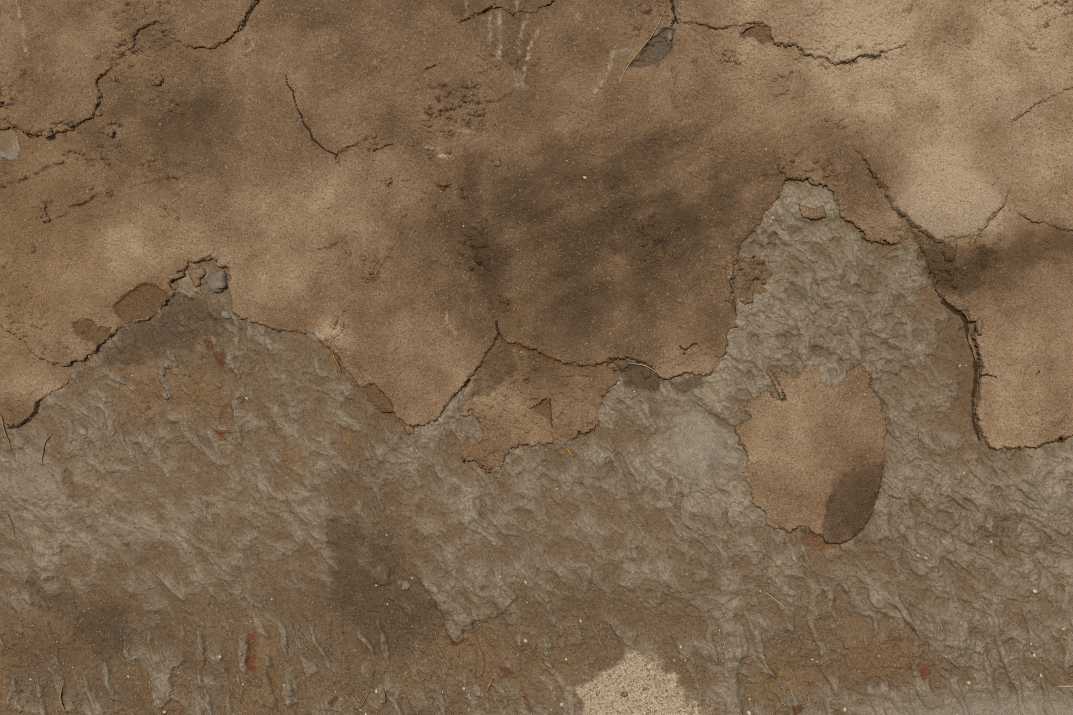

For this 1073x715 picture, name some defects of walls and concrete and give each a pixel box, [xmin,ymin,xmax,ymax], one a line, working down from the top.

crack [460,3,496,21]
crack [670,0,679,27]
crack [285,75,393,167]
spalling [113,283,168,321]
crack [940,300,997,440]